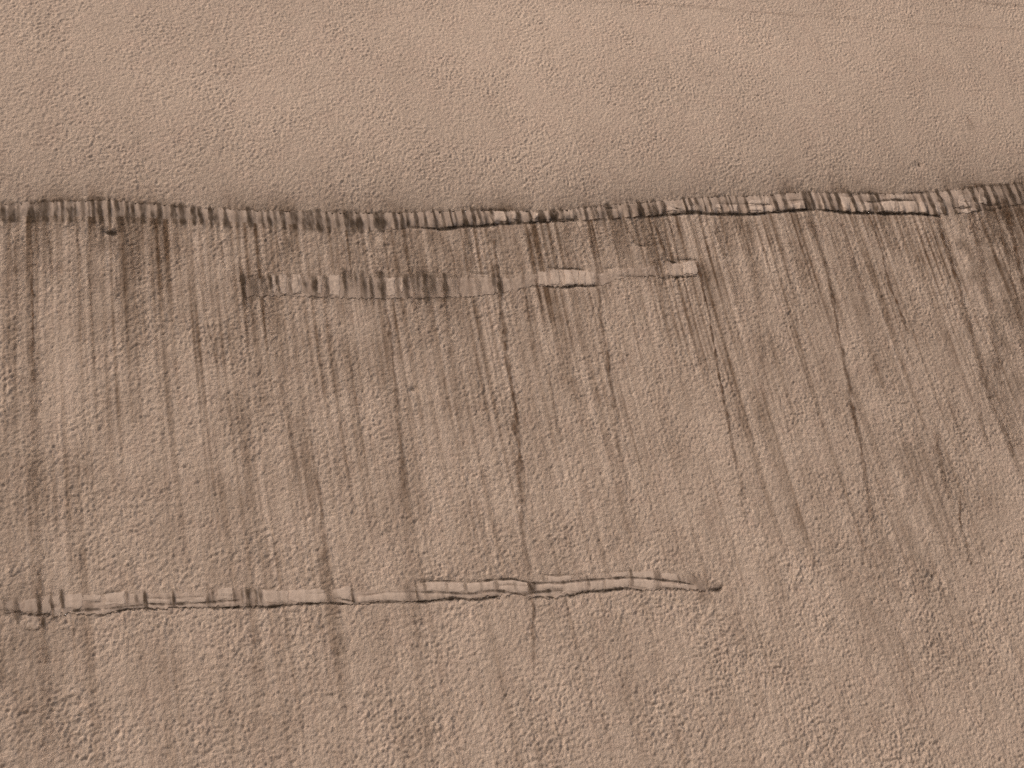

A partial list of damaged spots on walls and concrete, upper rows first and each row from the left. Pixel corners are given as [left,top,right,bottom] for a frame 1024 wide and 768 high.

crack [645,192,996,217]
water stain [246,207,562,232]
crack [414,210,574,231]
water stain [628,202,666,251]
water stain [921,182,1024,282]
water stain [342,271,384,297]
water stain [403,273,448,300]
crack [537,267,611,288]
water stain [502,328,521,462]
water stain [38,590,64,626]
crack [0,574,691,630]